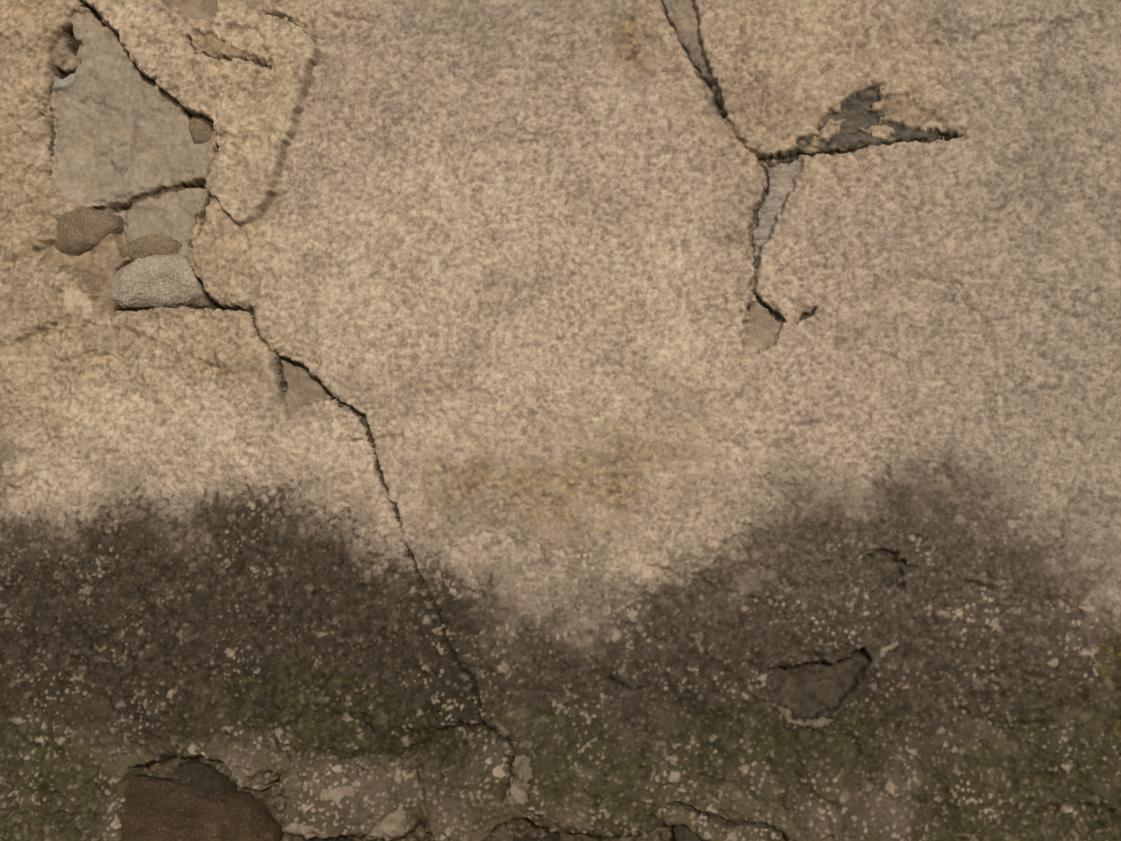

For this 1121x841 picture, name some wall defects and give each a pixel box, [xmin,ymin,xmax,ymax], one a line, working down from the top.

spalling [36,10,252,318]
crack [79,0,219,247]
crack [185,35,272,70]
crack [264,13,316,42]
crack [661,0,962,345]
spalling [752,85,956,268]
crack [186,279,423,578]
crack [325,632,514,800]
leakage [0,458,1121,783]
spalling [768,641,899,730]